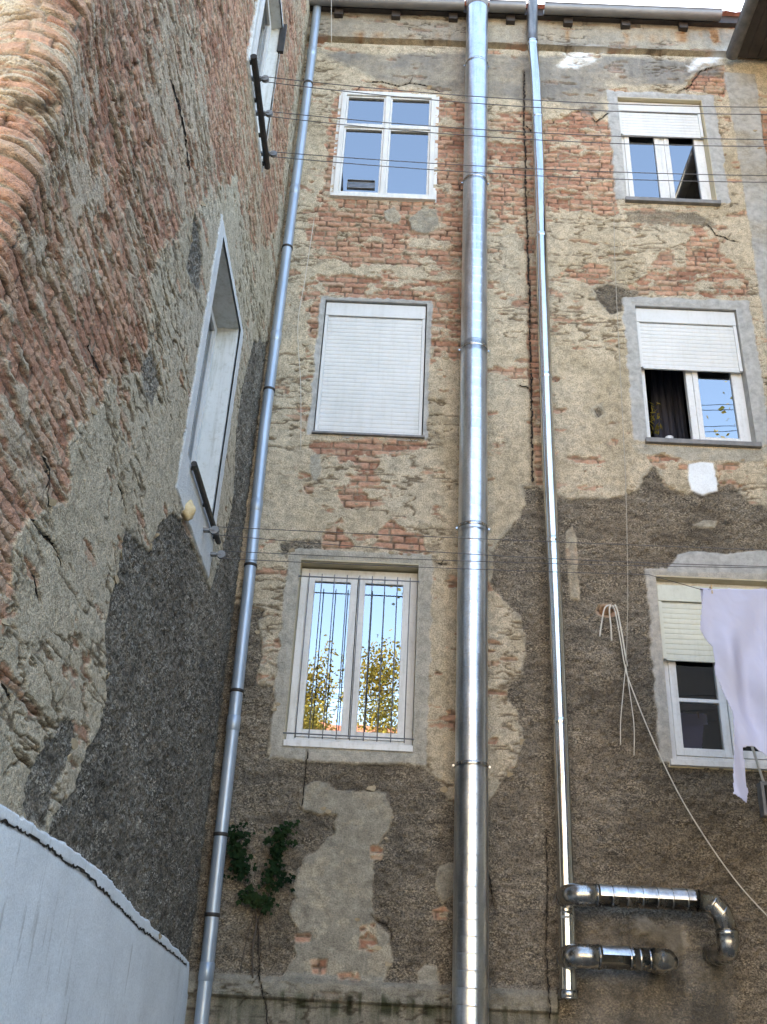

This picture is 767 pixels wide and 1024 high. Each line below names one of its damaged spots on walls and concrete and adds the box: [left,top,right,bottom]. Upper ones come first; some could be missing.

flaking render [0,0,307,634]
crack [170,79,190,171]
flaking render [299,83,465,364]
crack [344,79,439,92]
crack [519,72,534,482]
spalling [23,339,454,988]
crack [301,751,309,808]
spalling [487,106,767,1024]
crack [252,925,268,1024]